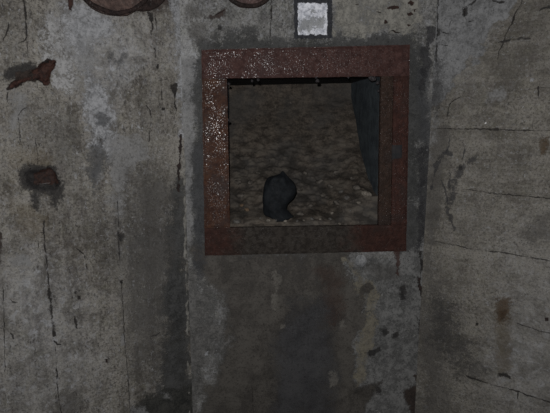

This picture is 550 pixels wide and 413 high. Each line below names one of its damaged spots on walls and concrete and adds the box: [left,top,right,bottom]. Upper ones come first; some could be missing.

water stain [131,26,453,413]
crack [437,124,550,132]